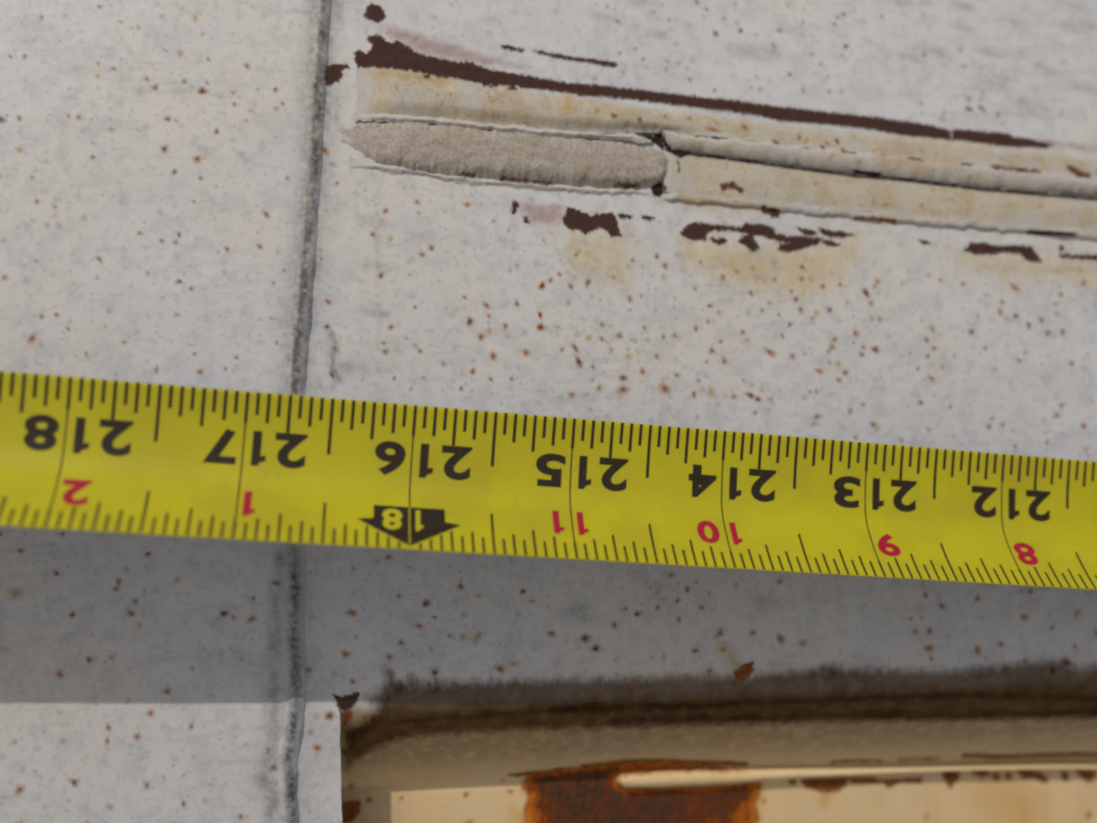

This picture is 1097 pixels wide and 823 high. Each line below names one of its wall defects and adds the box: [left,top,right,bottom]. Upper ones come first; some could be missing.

peeling [324,2,1054,149]
peeling [562,207,655,237]
peeling [680,208,855,252]
peeling [964,242,1043,262]
peeling [1058,244,1097,260]
rust [501,762,764,823]